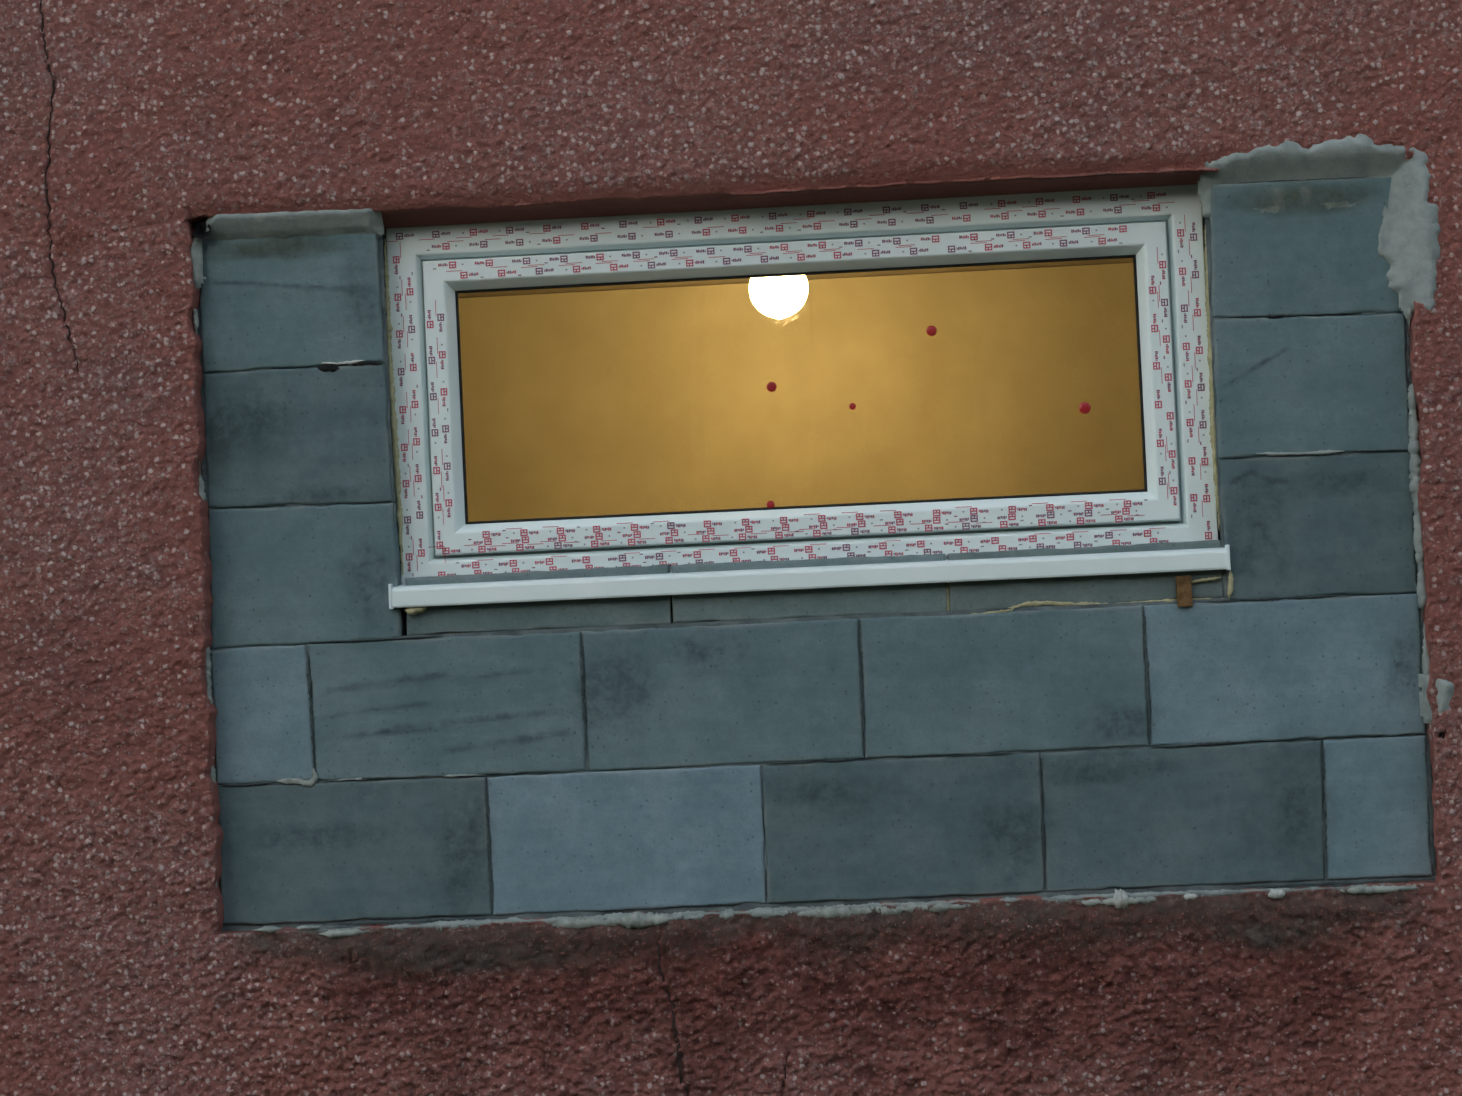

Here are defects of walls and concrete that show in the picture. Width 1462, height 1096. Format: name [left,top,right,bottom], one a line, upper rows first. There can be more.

crack [39,0,79,372]
crack [656,932,689,1096]